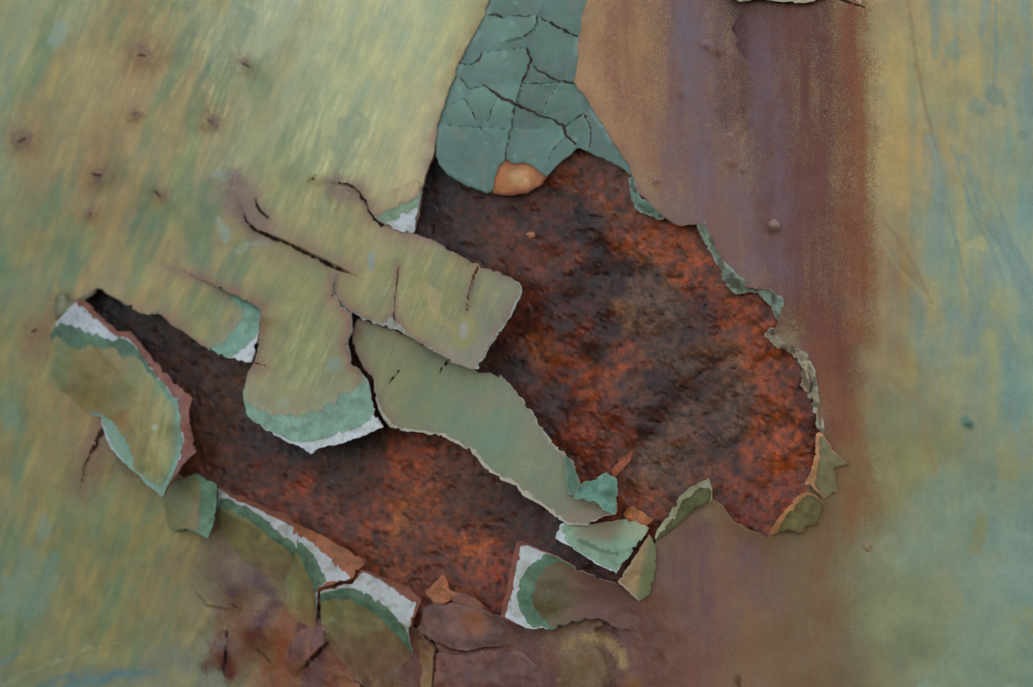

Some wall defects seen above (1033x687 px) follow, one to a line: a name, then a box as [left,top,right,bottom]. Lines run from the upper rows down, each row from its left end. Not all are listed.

crack [449,13,592,159]
crack [243,198,349,273]
crack [308,174,385,228]
crack [80,426,105,487]
peeling [49,176,712,687]
corrosion [18,146,820,687]
peeling [697,221,848,534]
crack [423,634,439,673]